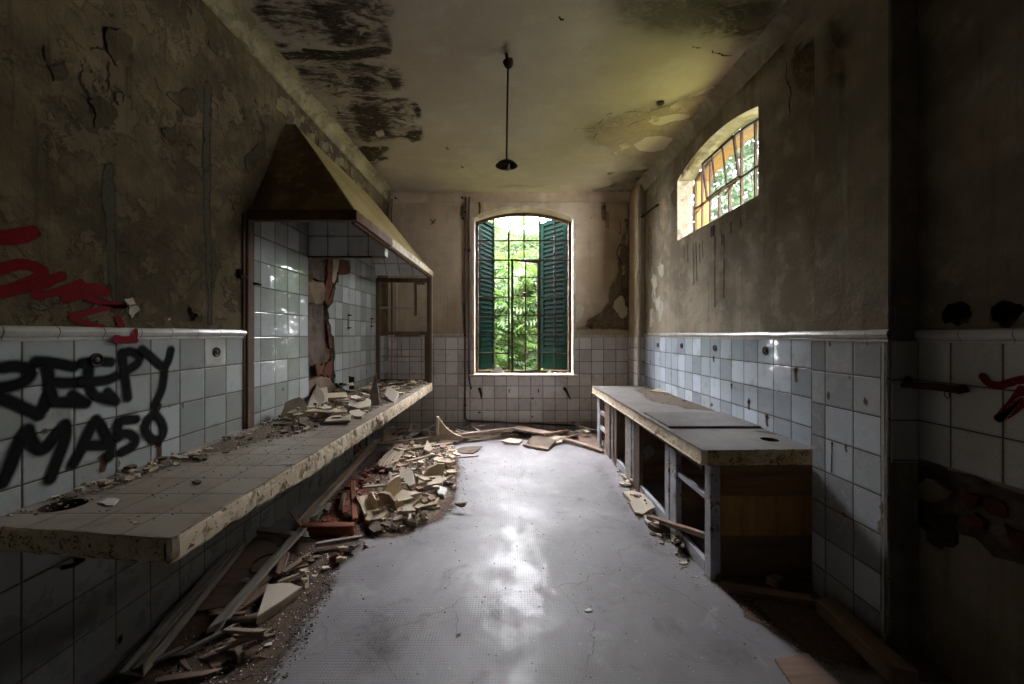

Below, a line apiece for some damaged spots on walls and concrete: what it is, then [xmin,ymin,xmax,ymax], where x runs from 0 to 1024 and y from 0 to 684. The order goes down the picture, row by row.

water stain [254,0,422,164]
flaking render [308,258,354,395]
flaking render [918,460,1024,566]